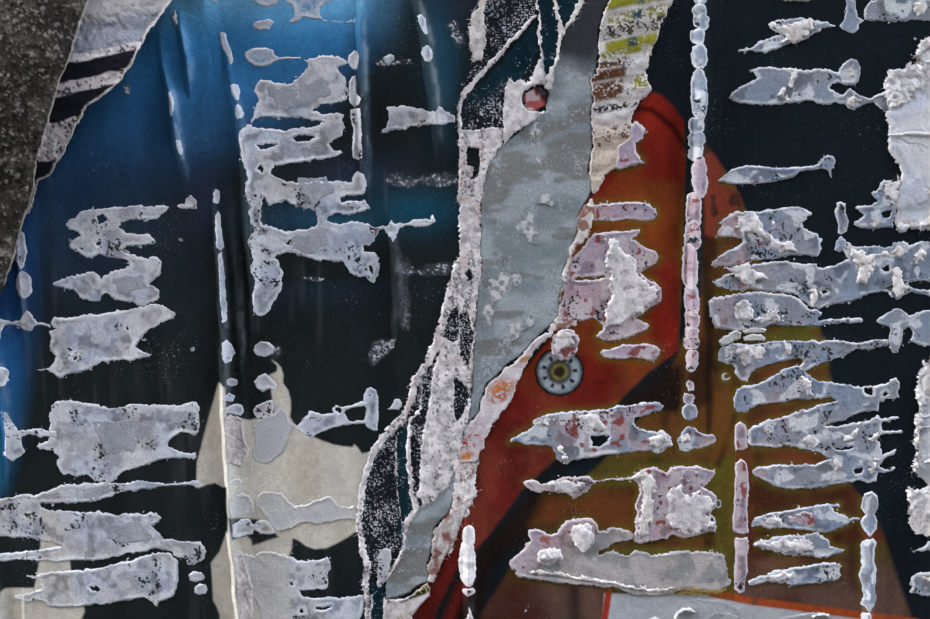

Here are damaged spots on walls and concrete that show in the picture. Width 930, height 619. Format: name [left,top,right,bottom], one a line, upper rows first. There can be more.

peeling [417,14,428,34]
peeling [421,45,433,62]
peeling [381,105,455,133]
peeling [0,195,197,378]
peeling [509,0,930,619]
peeling [0,367,9,387]
peeling [458,509,476,619]